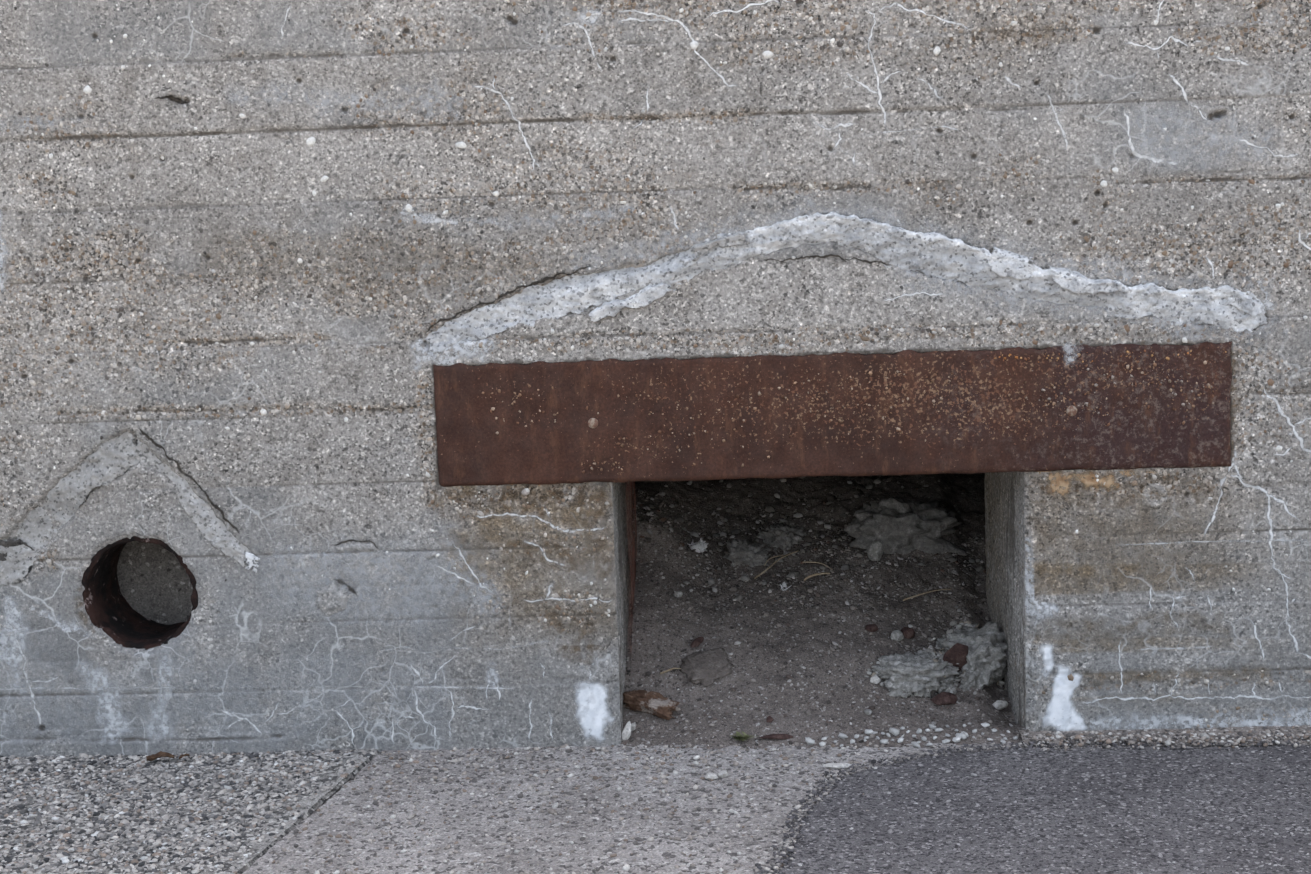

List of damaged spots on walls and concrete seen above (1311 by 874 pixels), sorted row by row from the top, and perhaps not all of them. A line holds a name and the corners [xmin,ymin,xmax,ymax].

spalling [0,0,1311,585]
corrosion [448,350,1219,563]
crack [1264,389,1311,456]
crack [334,539,377,548]
crack [437,547,494,594]
crack [477,510,610,602]
spalling [531,576,611,630]
crack [1084,452,1311,704]
crack [2,626,77,724]
crack [222,704,294,733]
crack [391,627,553,742]
spalling [1110,670,1293,693]